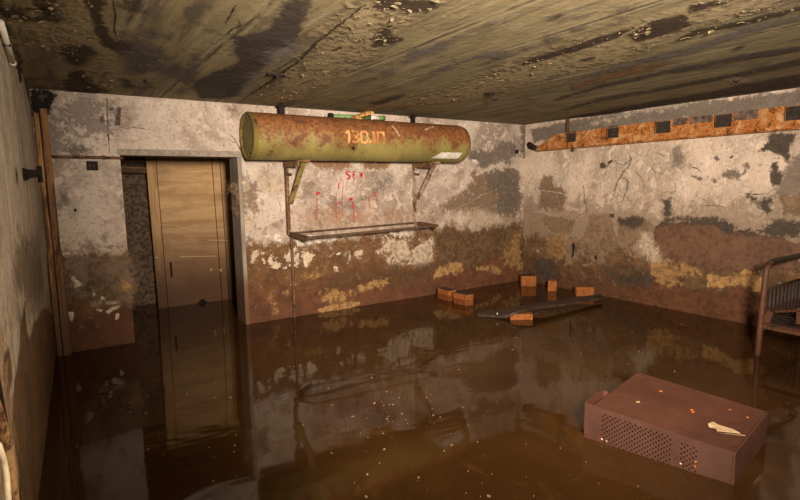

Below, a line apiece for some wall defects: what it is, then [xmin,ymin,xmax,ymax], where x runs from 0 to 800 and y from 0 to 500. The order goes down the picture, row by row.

damp [117,0,311,99]
damp [440,15,800,221]
damp [534,154,800,290]
peeling [92,290,120,320]
peeling [317,288,361,313]
damp [358,278,389,293]